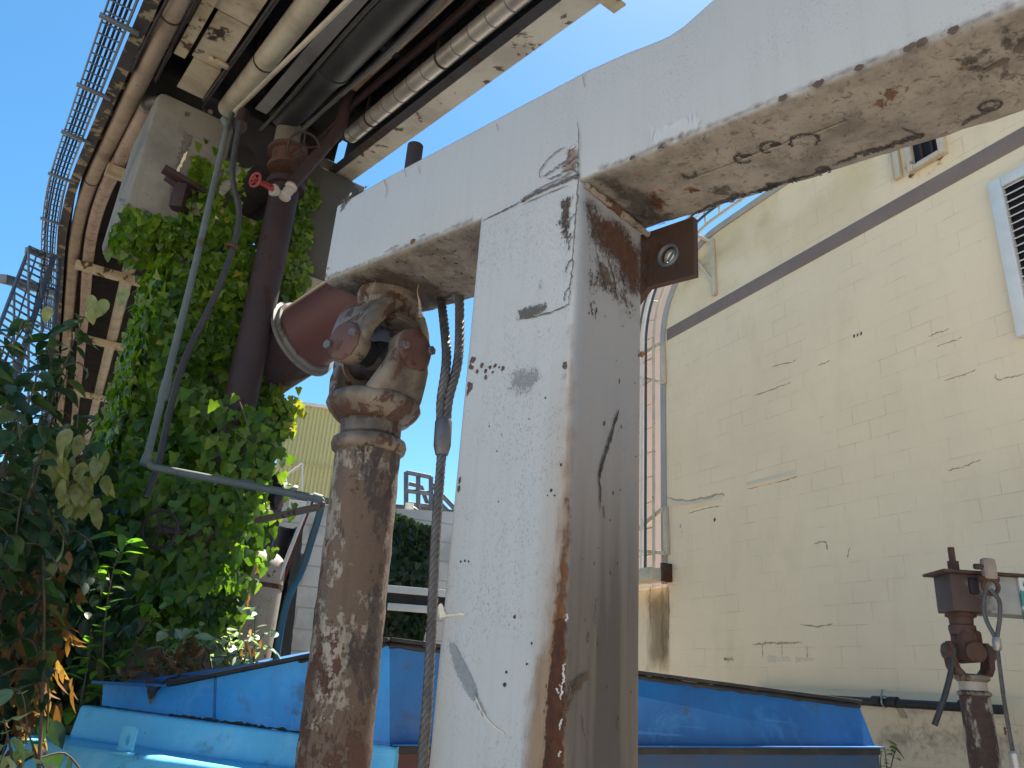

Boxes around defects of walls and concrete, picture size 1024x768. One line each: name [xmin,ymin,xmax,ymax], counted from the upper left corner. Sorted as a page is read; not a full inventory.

rust [869,86,903,111]
crack [693,128,925,215]
crack [484,122,579,305]
crack [944,369,1020,381]
crack [670,493,724,514]
rust [526,529,569,768]
water stain [649,586,670,662]
crack [752,624,832,662]